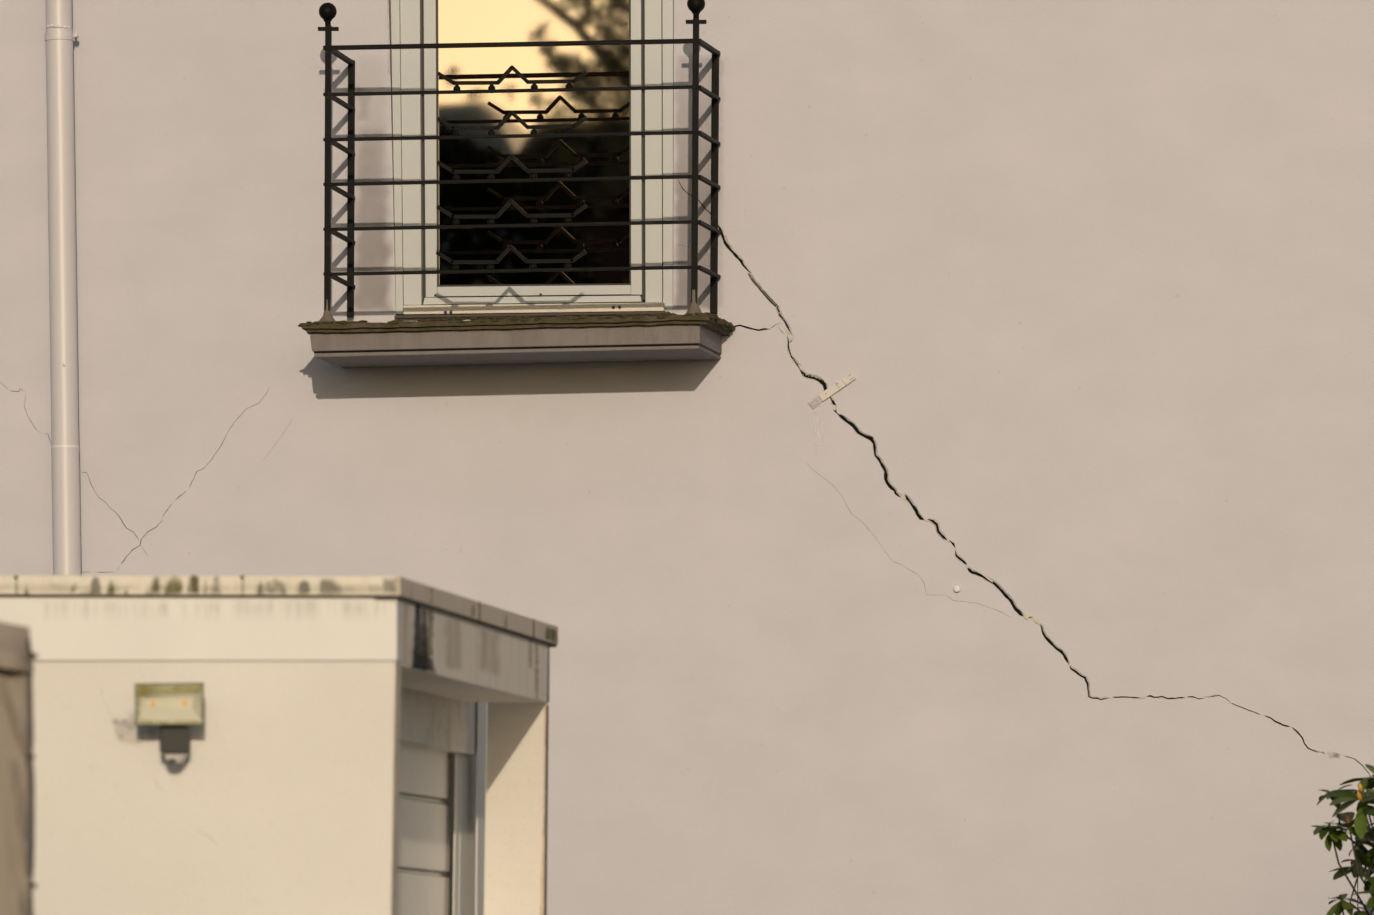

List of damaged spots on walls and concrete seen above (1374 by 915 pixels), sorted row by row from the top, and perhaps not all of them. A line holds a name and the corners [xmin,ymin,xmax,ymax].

crack [678,180,1371,777]
crack [90,482,157,573]
damp [413,605,435,672]